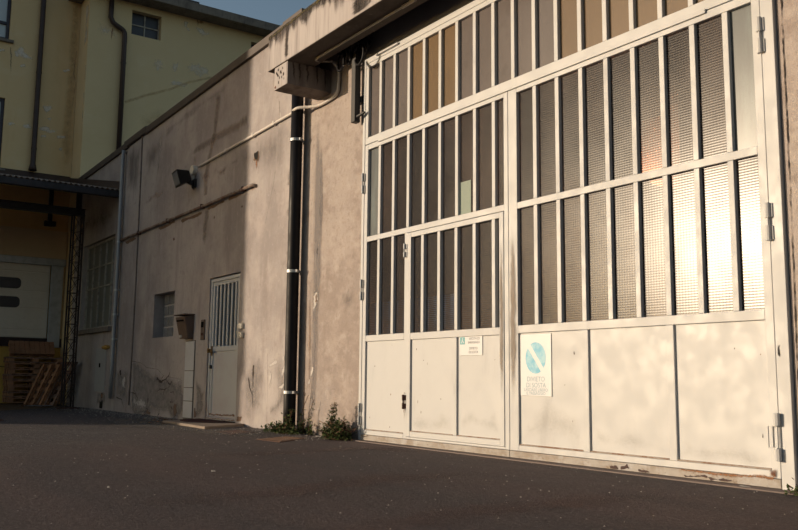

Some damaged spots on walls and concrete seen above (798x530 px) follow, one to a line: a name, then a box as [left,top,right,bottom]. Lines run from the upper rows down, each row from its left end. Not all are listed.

water stain [269,0,336,56]
water stain [354,0,371,14]
flaking render [132,367,183,418]